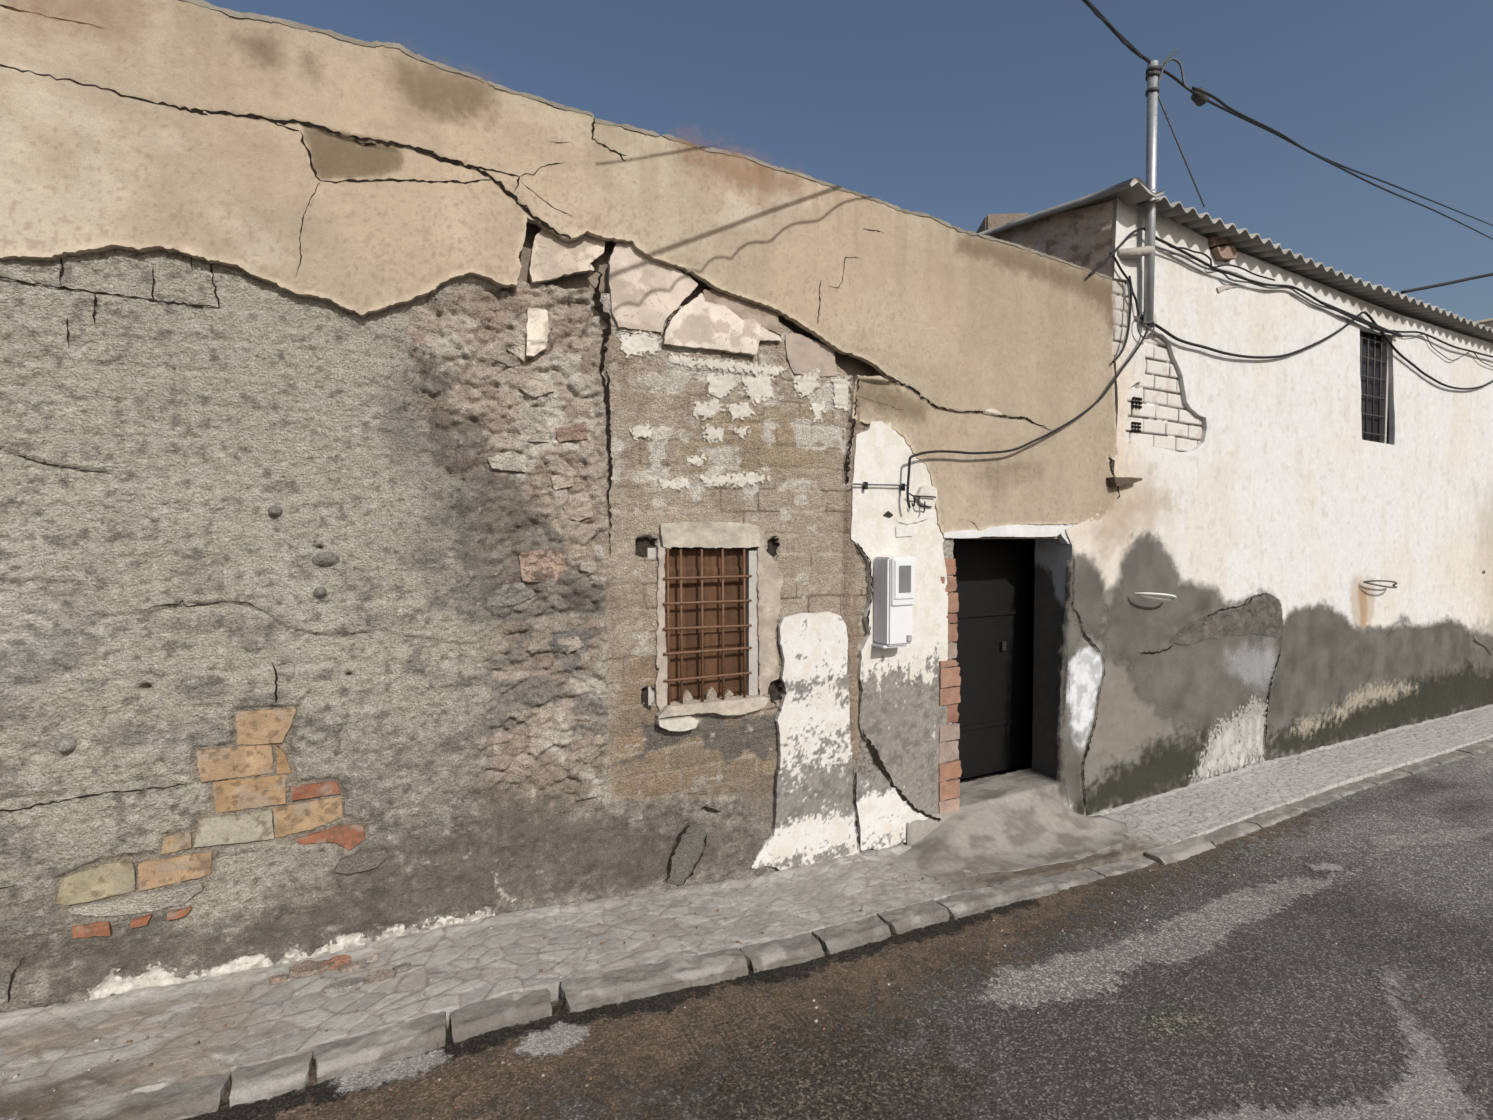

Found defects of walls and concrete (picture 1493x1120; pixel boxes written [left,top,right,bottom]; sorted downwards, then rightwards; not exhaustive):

crack [0,4,102,28]
crack [0,64,627,275]
crack [0,257,220,348]
crack [817,228,883,324]
flaking render [1112,279,1129,359]
crack [592,271,698,556]
flaking render [1125,334,1202,452]
crack [4,450,108,474]
crack [143,600,264,612]
crack [271,663,279,703]
flaking render [0,242,1076,1013]
damp [1060,533,1474,810]